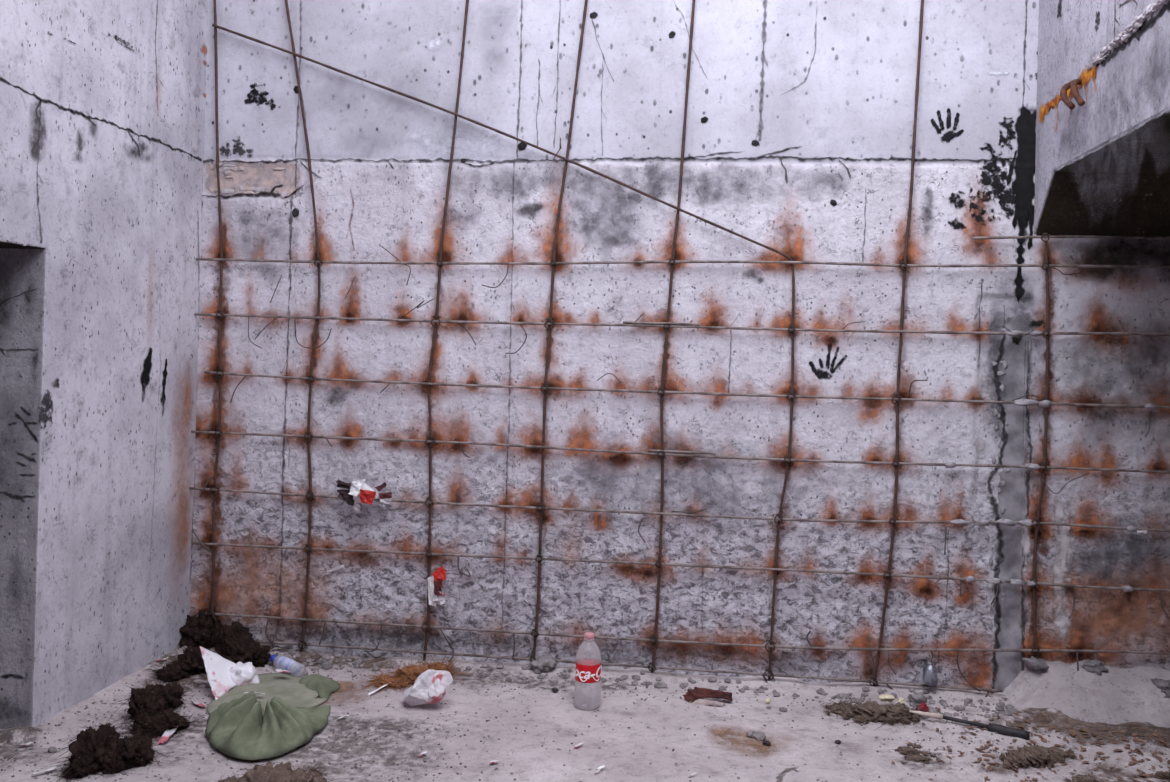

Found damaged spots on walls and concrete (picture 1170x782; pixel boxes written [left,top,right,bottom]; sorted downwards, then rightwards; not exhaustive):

rust [1039,65,1096,132]
leakage [647,166,672,198]
leakage [519,204,543,216]
leakage [583,183,632,244]
rust [754,227,804,269]
leakage [1084,238,1170,276]
rust [341,290,360,324]
crack [0,0,1016,629]
rust [699,302,725,331]
rust [385,301,479,408]
rust [566,430,692,466]
rust [1020,352,1115,663]